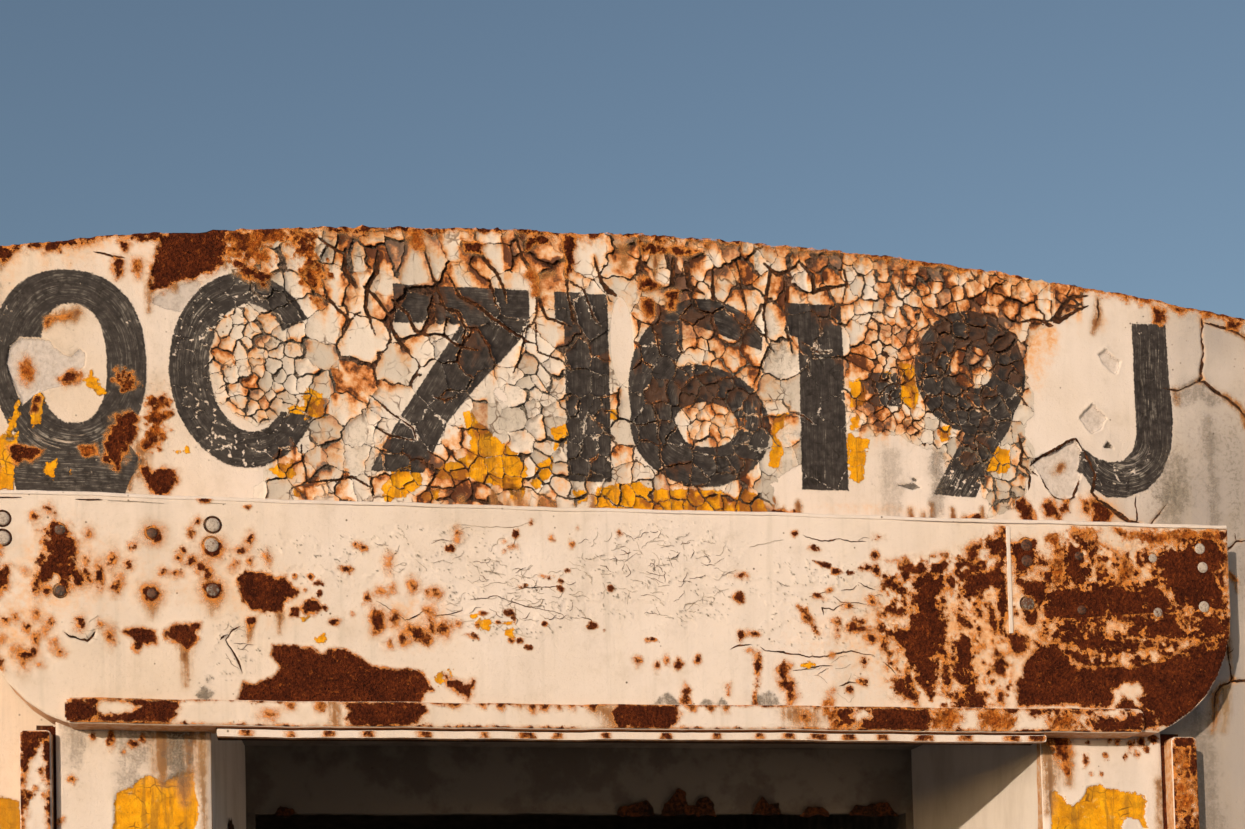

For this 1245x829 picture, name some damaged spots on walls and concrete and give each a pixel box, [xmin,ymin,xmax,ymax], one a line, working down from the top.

corrosion [78,365,179,495]
spalling [153,280,202,312]
crack [310,231,617,373]
corrosion [0,225,1032,319]
peeling [201,227,1113,518]
crack [638,248,848,384]
crack [1018,295,1089,327]
crack [1164,318,1245,428]
corrosion [0,505,163,671]
corrosion [65,497,1238,829]
peeling [112,773,199,829]
peeling [1051,784,1149,829]